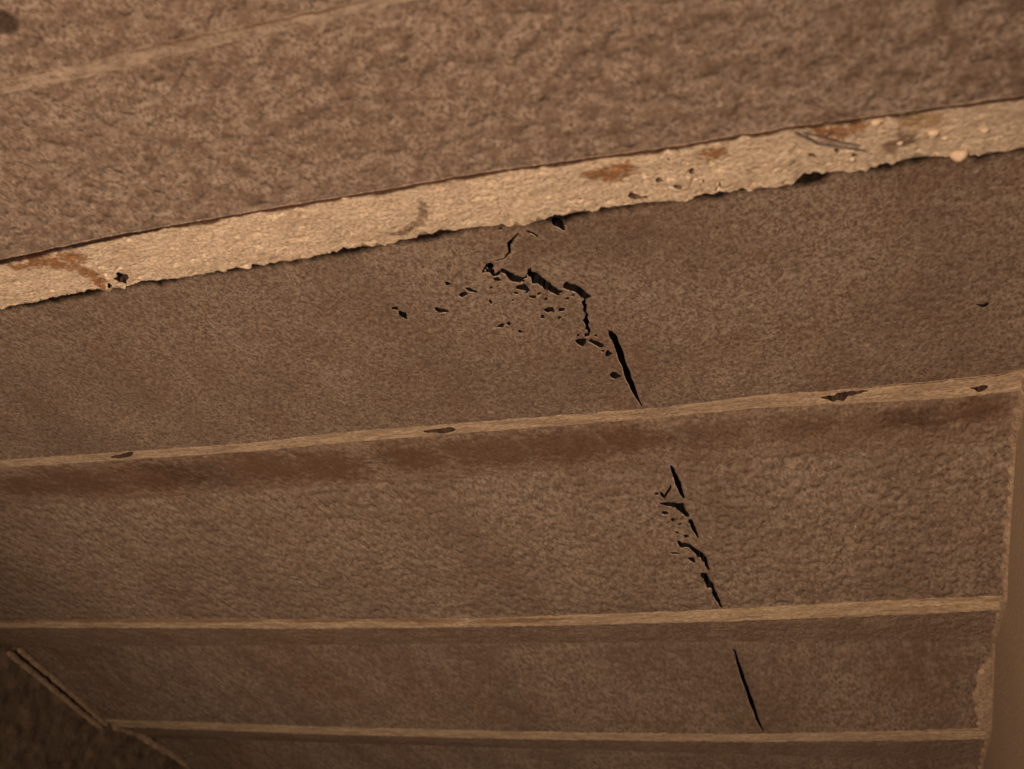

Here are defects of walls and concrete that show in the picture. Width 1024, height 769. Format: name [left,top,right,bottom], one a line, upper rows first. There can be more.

corrosion [0,95,1024,292]
spalling [0,95,1024,309]
crack [392,306,407,320]
crack [435,217,642,406]
crack [655,465,723,609]
crack [732,649,764,732]